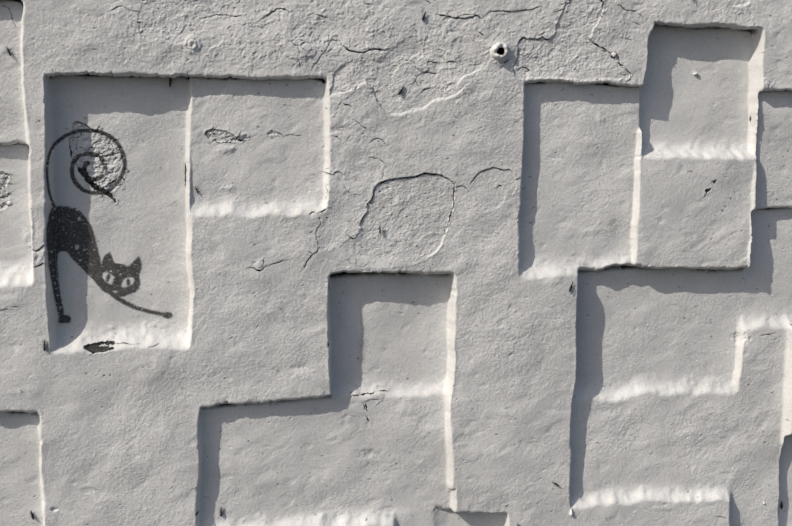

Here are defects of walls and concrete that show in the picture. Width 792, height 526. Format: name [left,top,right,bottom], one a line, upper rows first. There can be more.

crack [428,1,538,36]
crack [293,35,381,65]
crack [589,0,640,79]
flaking render [205,127,250,143]
flaking render [69,121,129,203]
flaking render [0,171,11,210]
crack [304,171,350,268]